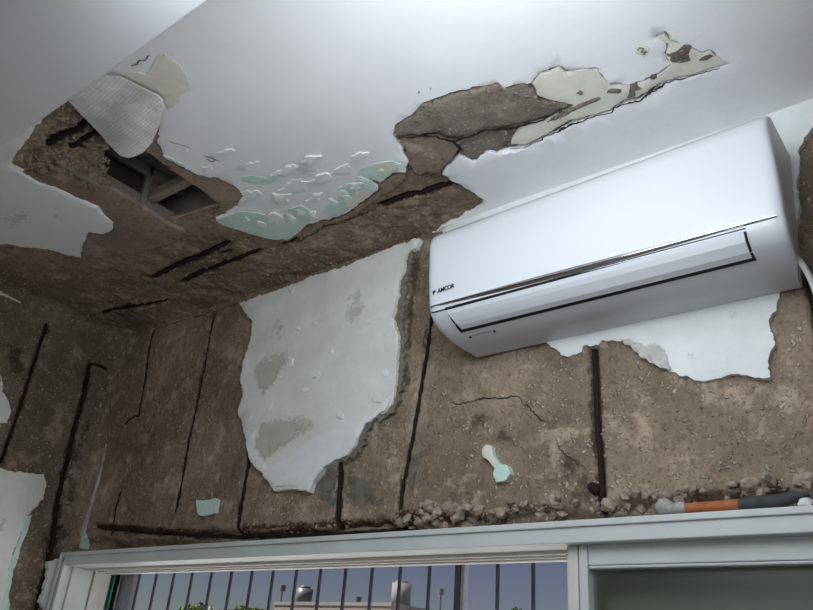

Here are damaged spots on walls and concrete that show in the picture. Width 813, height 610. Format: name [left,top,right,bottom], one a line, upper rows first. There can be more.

spalling [0,101,483,610]
spalling [394,31,728,177]
spalling [332,98,813,530]